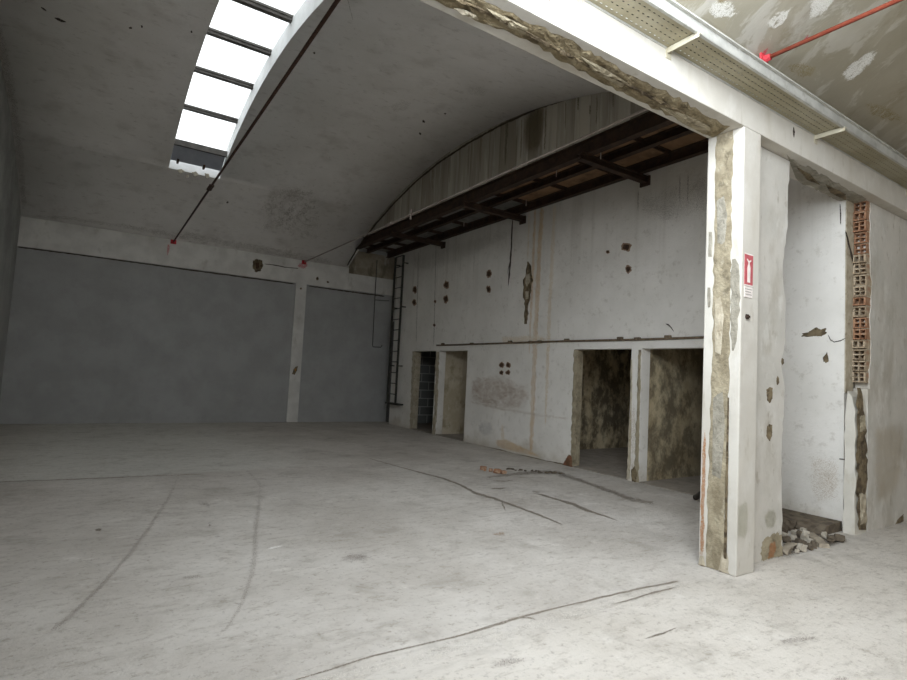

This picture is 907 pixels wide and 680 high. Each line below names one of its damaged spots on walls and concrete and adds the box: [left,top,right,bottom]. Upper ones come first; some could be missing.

peeling [766,7,792,29]
peeling [808,0,834,19]
peeling [843,51,877,81]
spalling [435,0,749,575]
spalling [787,155,872,530]
crack [370,458,617,524]
spalling [760,532,783,561]
crack [294,580,680,680]